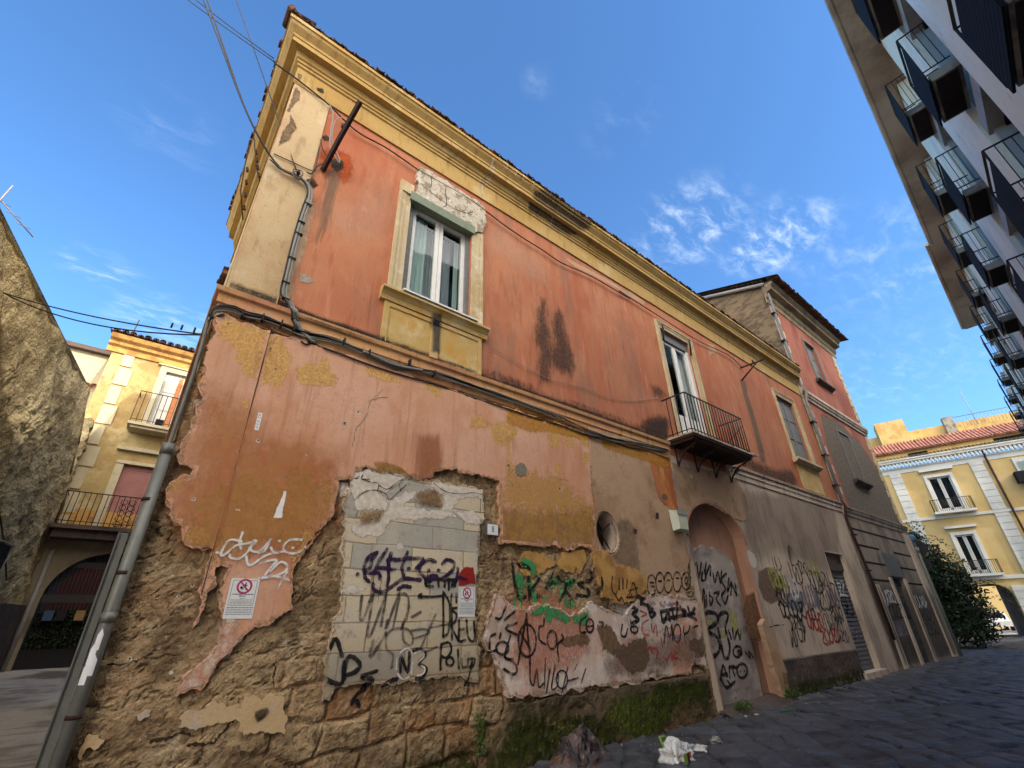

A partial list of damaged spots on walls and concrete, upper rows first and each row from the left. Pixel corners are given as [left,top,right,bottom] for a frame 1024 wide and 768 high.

rust [322,150,352,180]
spalling [415,167,487,234]
damp [481,158,591,235]
damp [234,285,668,440]
spalling [65,318,719,768]